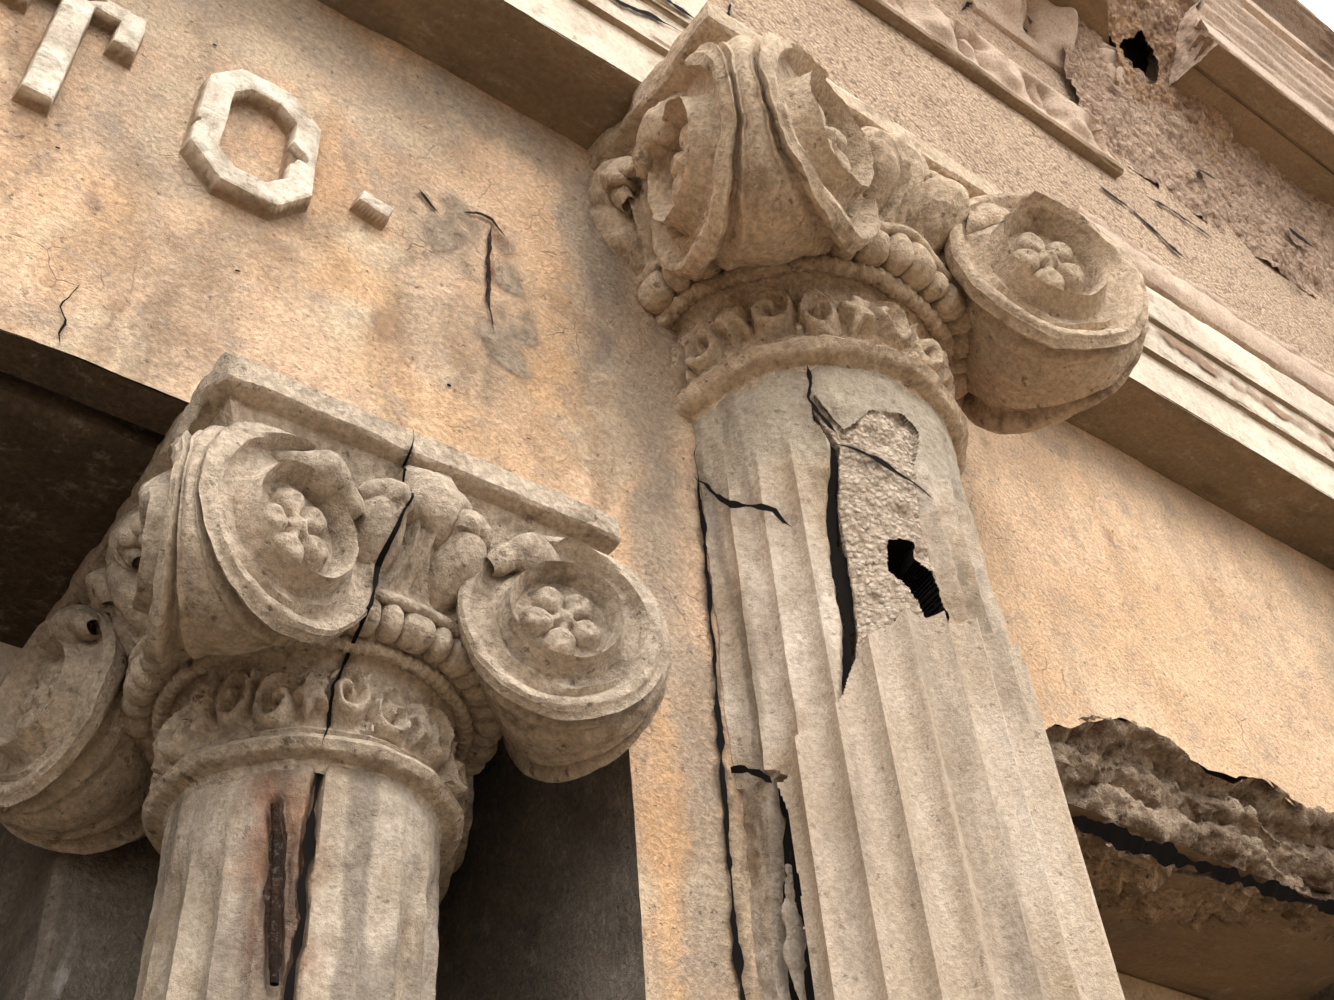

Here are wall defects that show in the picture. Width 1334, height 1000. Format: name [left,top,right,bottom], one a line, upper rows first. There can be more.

crack [612,0,694,30]
crack [418,190,438,212]
spalling [1063,16,1334,305]
crack [805,365,931,691]
spalling [814,398,949,668]
crack [284,430,414,1000]
crack [694,446,815,1000]
rust [263,803,286,986]